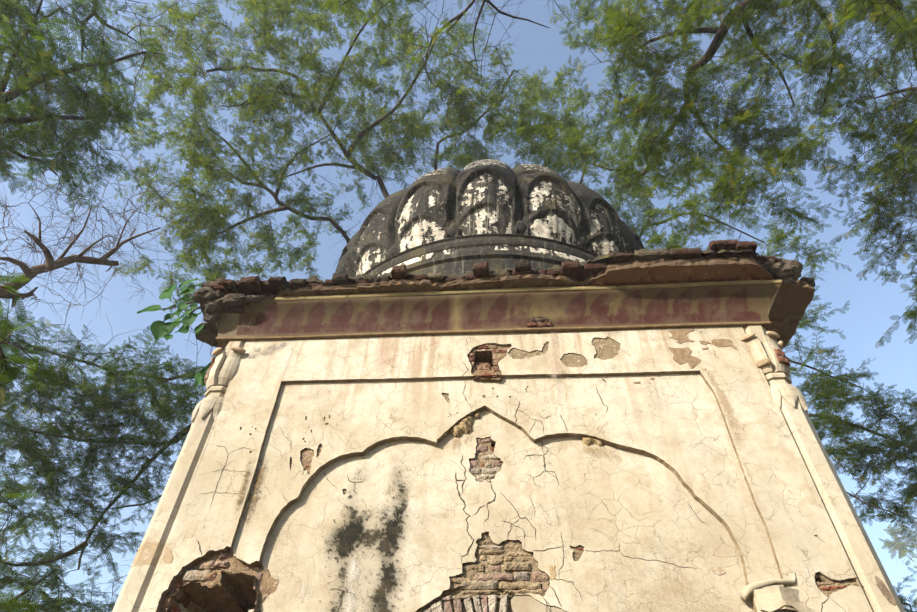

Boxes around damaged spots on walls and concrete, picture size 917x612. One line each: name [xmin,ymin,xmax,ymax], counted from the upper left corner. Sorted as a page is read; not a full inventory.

peeling [355,168,454,276]
peeling [460,159,512,236]
peeling [495,164,584,262]
spalling [467,341,549,398]
spalling [156,546,278,612]
crack [203,427,362,507]
damp [325,467,408,612]
spalling [469,436,503,483]
spalling [435,532,555,602]
crack [455,399,583,611]
crack [586,544,696,569]
spalling [814,572,863,598]